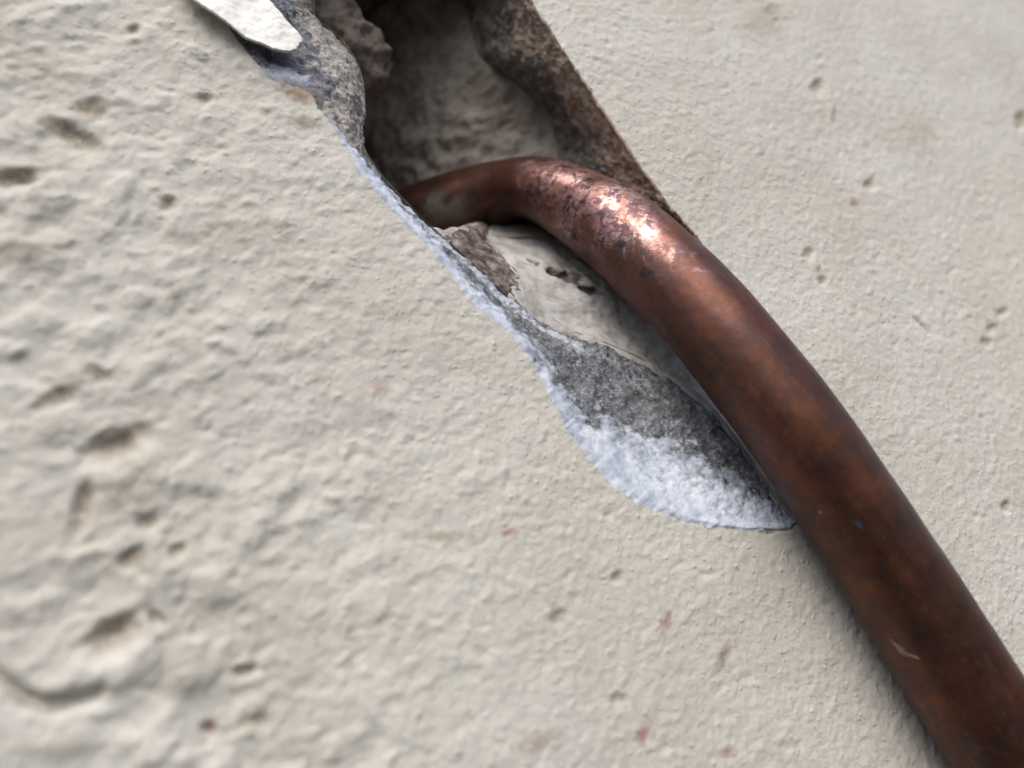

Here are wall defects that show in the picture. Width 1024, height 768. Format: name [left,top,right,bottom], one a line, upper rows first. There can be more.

spalling [193,0,796,532]